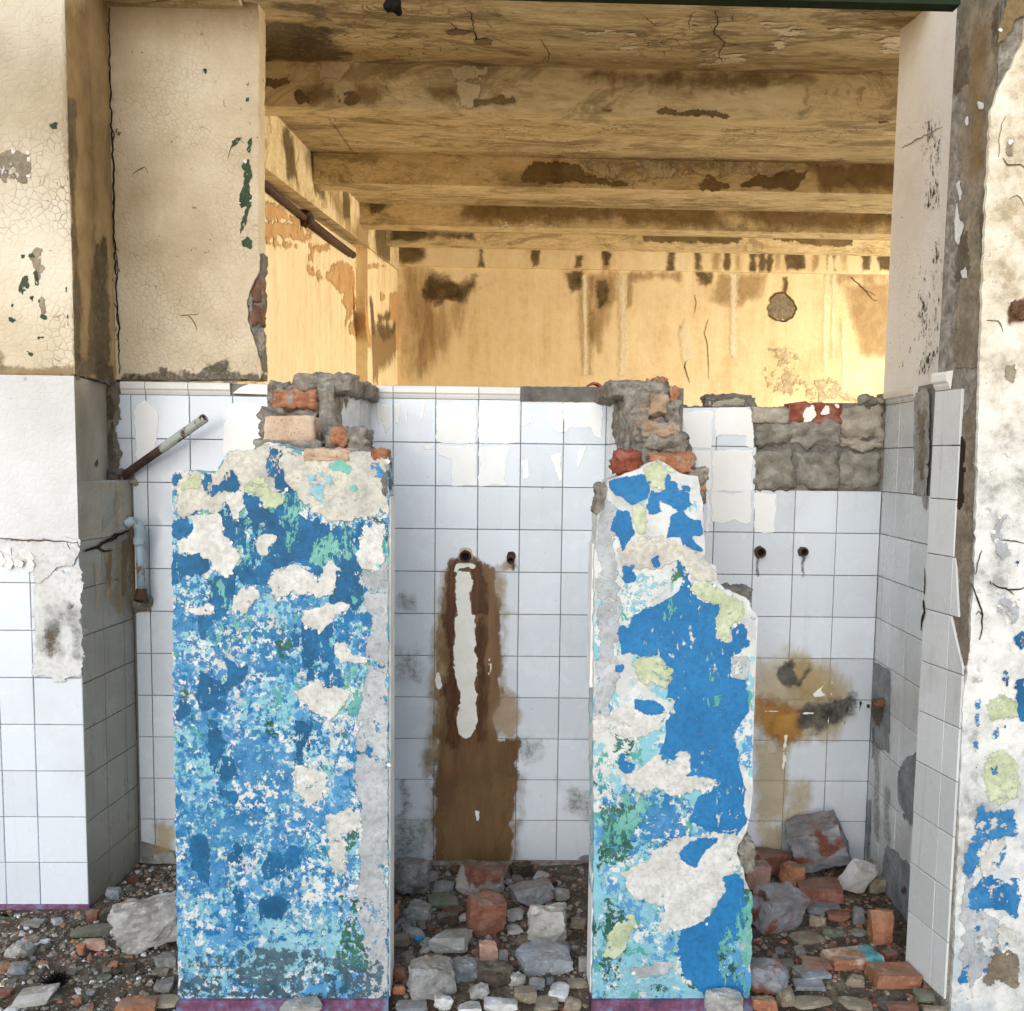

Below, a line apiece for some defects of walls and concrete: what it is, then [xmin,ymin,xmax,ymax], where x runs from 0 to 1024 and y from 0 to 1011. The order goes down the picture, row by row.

crack [644,11,752,61]
crack [108,8,148,373]
damp [284,129,297,180]
damp [315,186,475,318]
damp [462,205,892,230]
spalling [953,0,1024,369]
damp [370,297,396,384]
peeling [750,346,885,492]
crack [0,530,129,552]
peeling [171,443,391,998]
rust [428,550,521,861]
peeling [620,829,741,931]